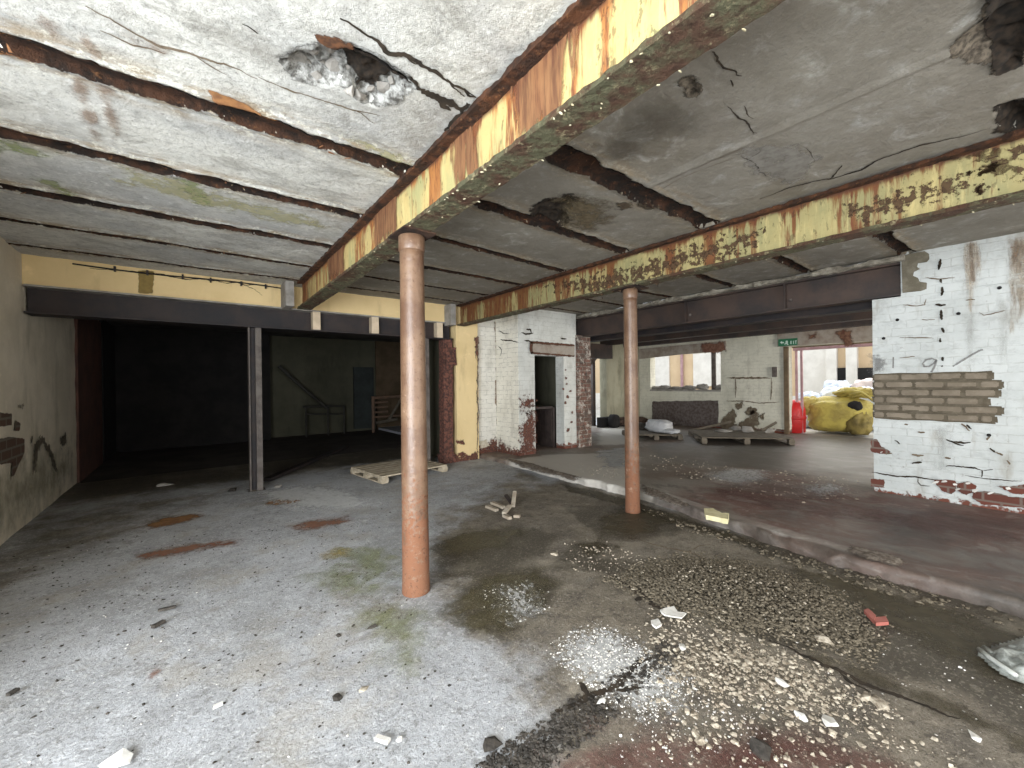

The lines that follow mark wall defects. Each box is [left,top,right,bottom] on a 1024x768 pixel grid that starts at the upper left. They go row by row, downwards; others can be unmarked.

crack [85,6,377,123]
spalling [278,34,417,107]
crack [340,18,476,131]
corrosion [510,26,578,137]
crack [651,51,986,199]
spalling [949,0,1024,76]
leakage [529,193,659,231]
corrosion [424,145,766,313]
corrosion [843,144,1024,255]
peeling [933,480,1024,508]
leakage [447,573,554,630]
leakage [566,630,679,709]